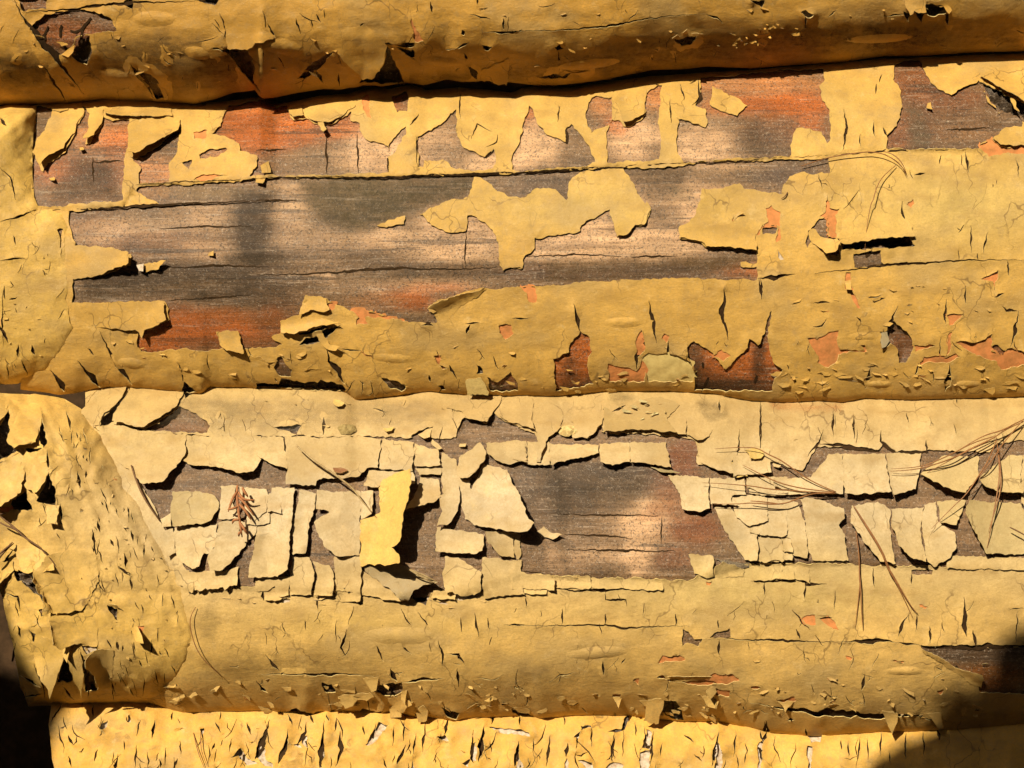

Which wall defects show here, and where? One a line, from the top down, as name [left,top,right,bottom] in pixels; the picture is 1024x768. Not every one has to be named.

peeling [19,0,125,57]
peeling [882,0,952,20]
peeling [886,60,1024,157]
peeling [32,11,831,380]
crack [0,95,1018,378]
peeling [0,399,60,525]
peeling [0,530,129,699]
peeling [318,677,450,723]
crack [7,322,1024,768]
peeling [81,271,1024,608]
peeling [613,628,741,724]
crack [808,288,966,456]